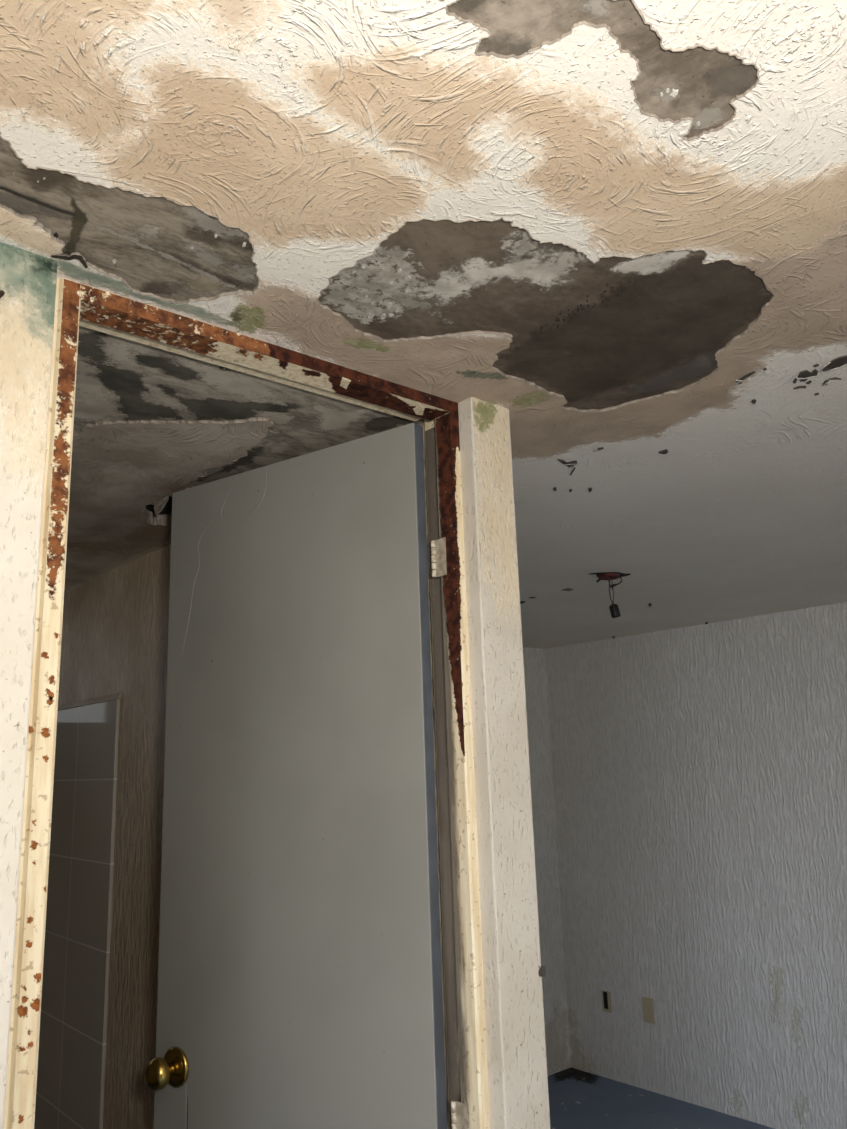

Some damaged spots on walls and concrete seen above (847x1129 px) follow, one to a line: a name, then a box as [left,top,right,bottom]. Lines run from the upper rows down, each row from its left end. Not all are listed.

spalling [445,0,760,141]
spalling [0,132,260,304]
spalling [73,326,425,489]
water stain [0,0,847,591]
spalling [316,217,775,413]
peeling [793,355,847,396]
corrosion [38,279,465,756]
corrosion [17,973,41,1051]